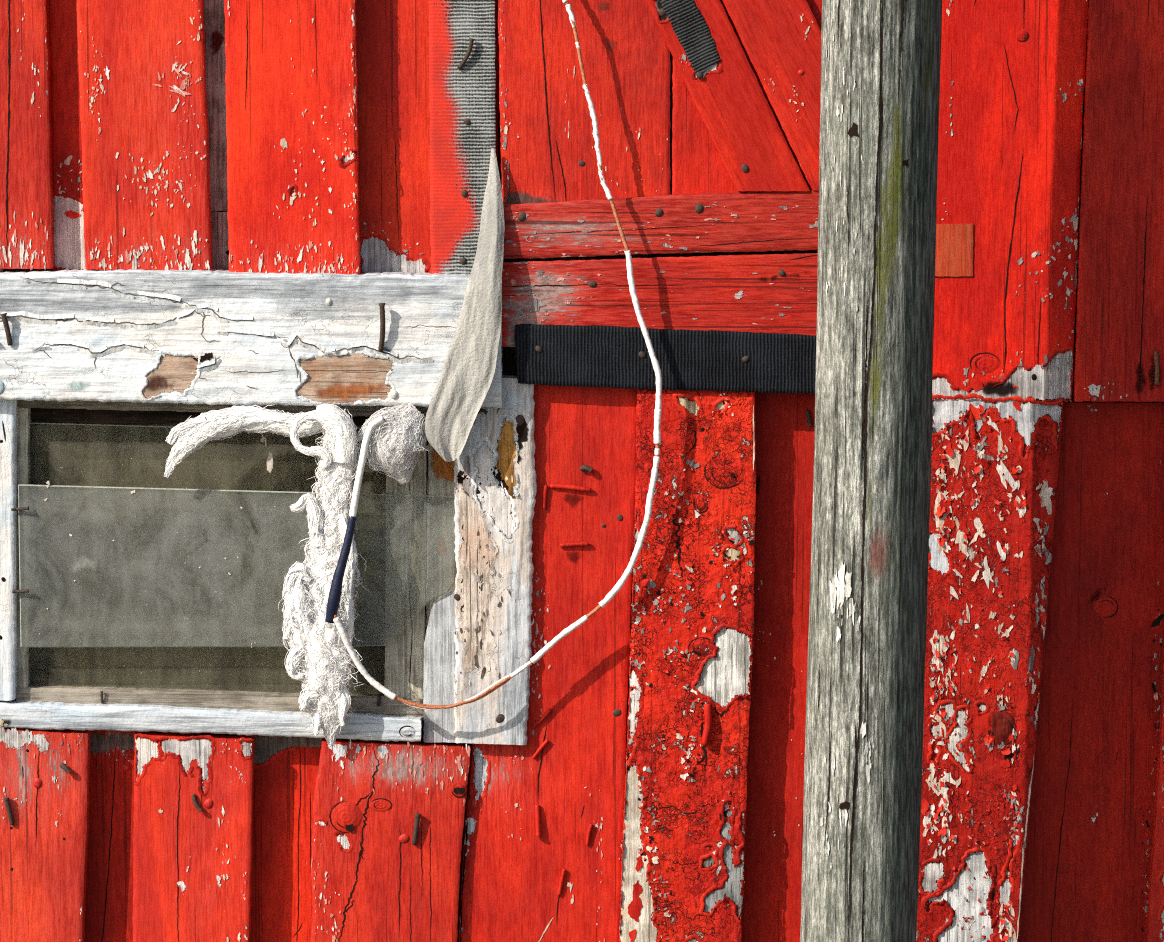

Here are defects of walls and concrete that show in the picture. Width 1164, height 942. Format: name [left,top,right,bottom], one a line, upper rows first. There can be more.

peeling [153,0,205,128]
peeling [0,31,431,314]
crack [0,0,451,396]
peeling [139,349,201,401]
peeling [672,392,734,419]
peeling [663,489,709,526]
peeling [918,198,1128,942]
peeling [0,718,491,880]
crack [339,744,379,941]
peeling [619,508,771,942]